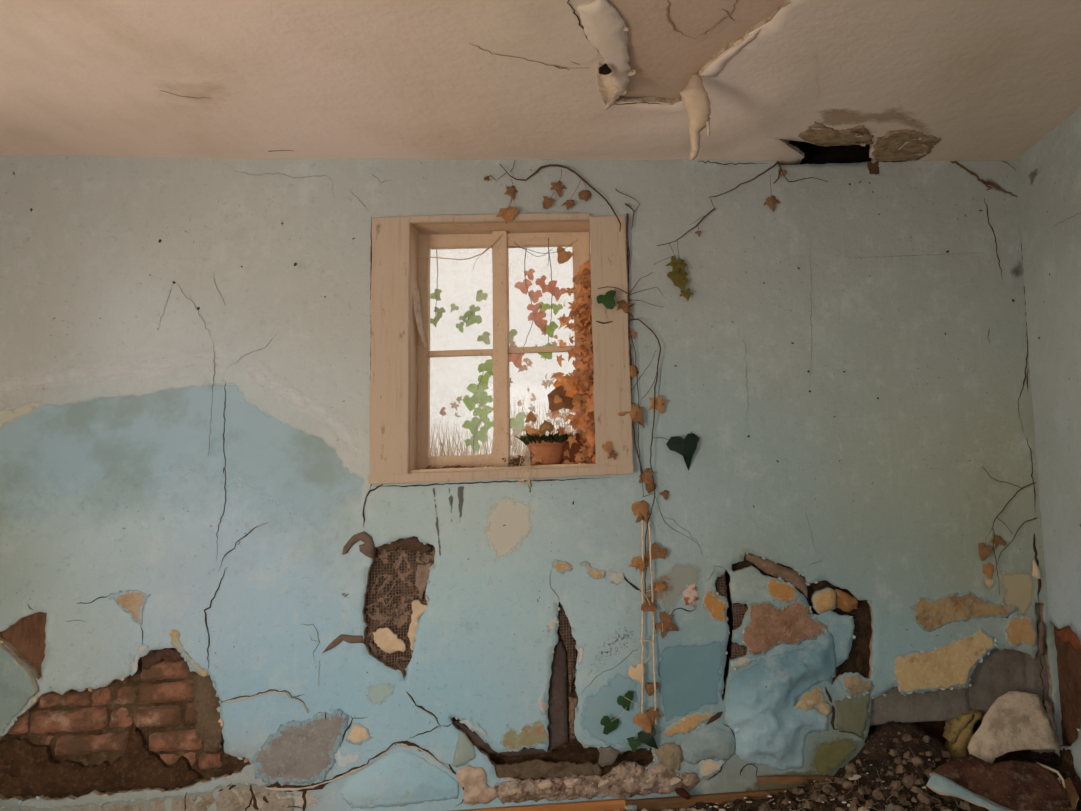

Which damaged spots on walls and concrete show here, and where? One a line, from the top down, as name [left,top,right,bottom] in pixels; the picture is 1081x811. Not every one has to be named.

crack [474,0,599,70]
spalling [798,121,942,162]
crack [160,283,276,672]
crack [362,484,383,527]
spalling [0,612,47,680]
peeling [108,589,151,626]
spalling [0,629,373,811]
crack [218,624,464,811]
spalling [322,531,435,680]
spalling [448,602,727,811]
spalling [682,552,1081,763]